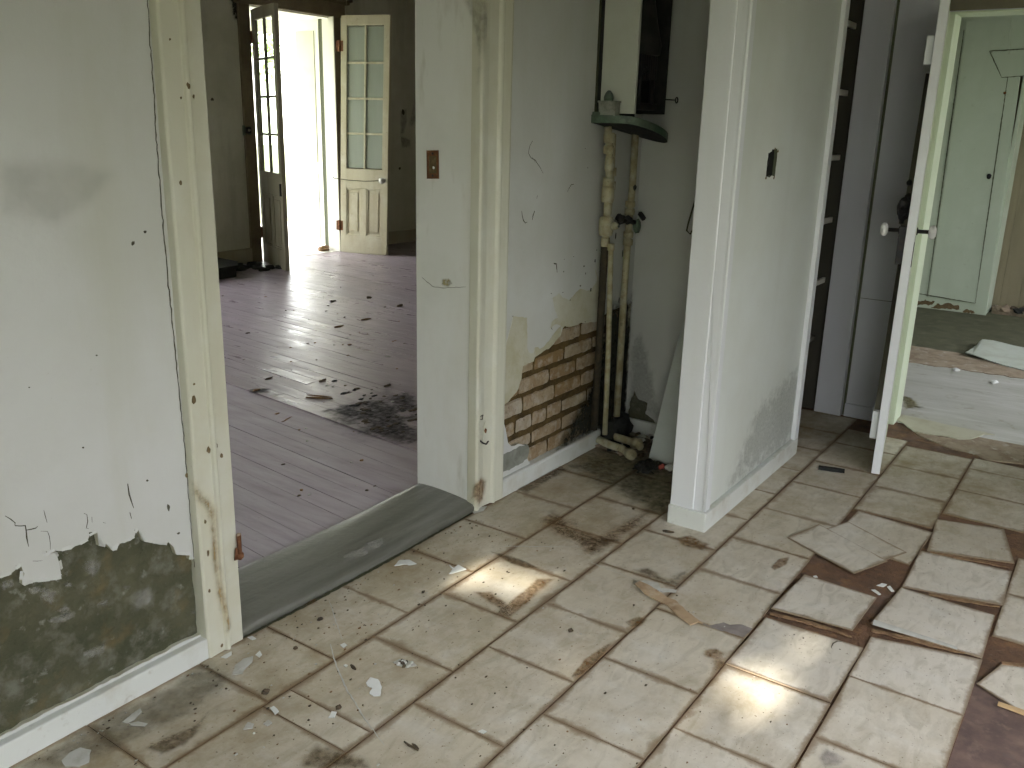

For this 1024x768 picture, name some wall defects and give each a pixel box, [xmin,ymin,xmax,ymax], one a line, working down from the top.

flaking render [504,265,620,461]
crack [6,512,51,550]
peeling [0,528,209,734]